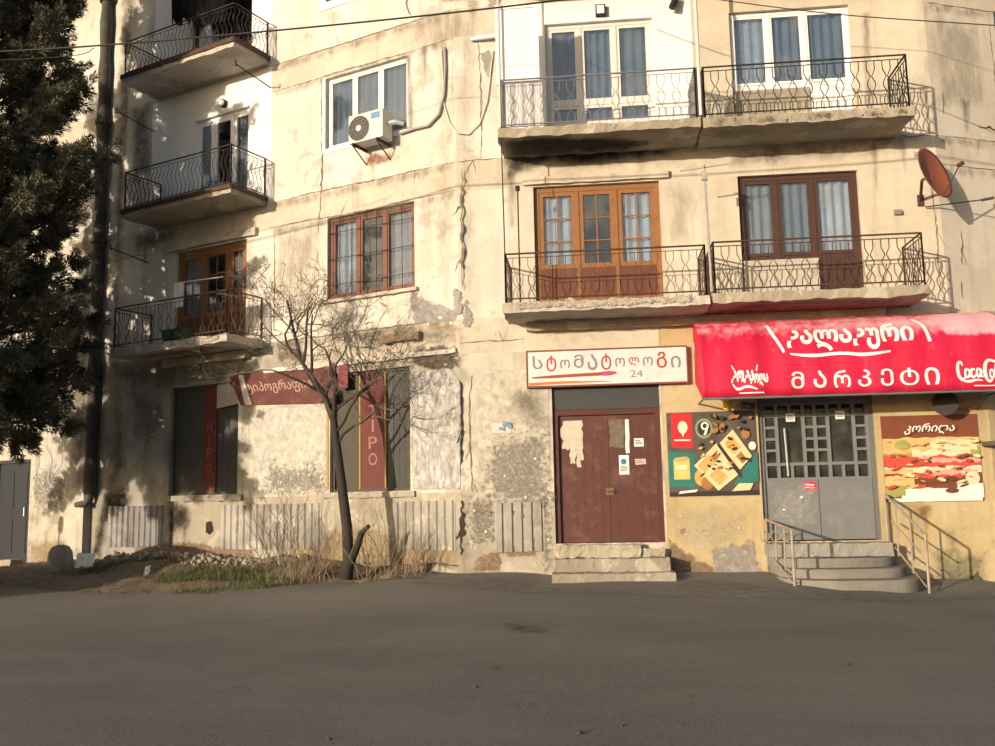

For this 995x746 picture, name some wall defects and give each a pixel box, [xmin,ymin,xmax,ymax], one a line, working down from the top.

crack [929,2,995,81]
crack [263,0,499,359]
crack [900,126,995,170]
crack [931,188,966,297]
crack [336,330,518,368]
peeling [410,288,473,327]
peeling [412,345,461,490]
crack [456,377,515,555]
peeling [460,434,558,571]